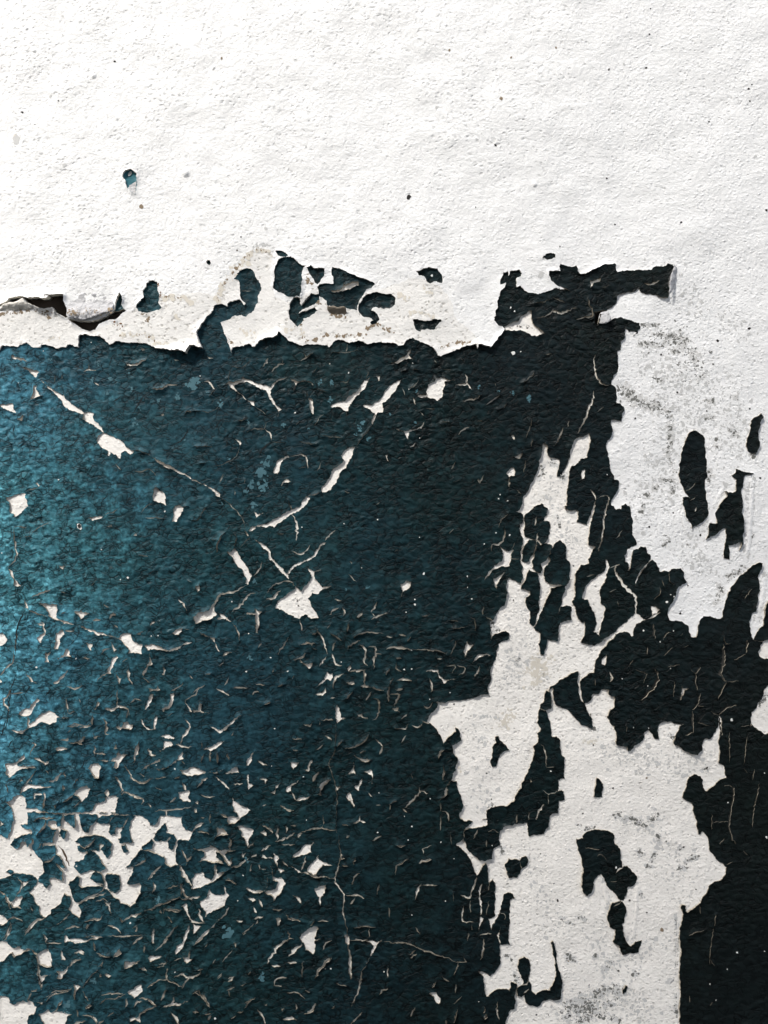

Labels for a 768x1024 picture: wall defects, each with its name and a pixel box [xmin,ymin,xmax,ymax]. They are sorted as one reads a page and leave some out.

peeling [66,281,162,320]
spalling [273,251,396,327]
spalling [416,267,443,283]
spalling [504,311,543,336]
spalling [418,378,450,401]
crack [508,357,608,494]
spalling [746,408,764,454]
spalling [673,431,761,560]
crack [0,349,553,1024]
spalling [427,433,726,1024]
spalling [751,686,768,734]
spalling [0,687,373,1024]